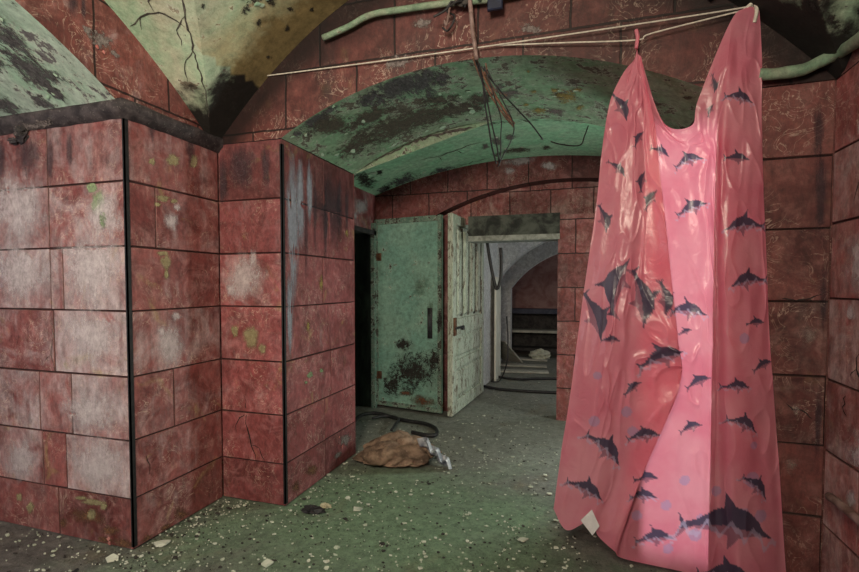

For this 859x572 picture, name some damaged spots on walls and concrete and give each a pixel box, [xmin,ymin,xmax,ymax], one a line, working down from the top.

crack [131,0,209,117]
leakage [357,68,455,108]
leakage [287,168,312,346]